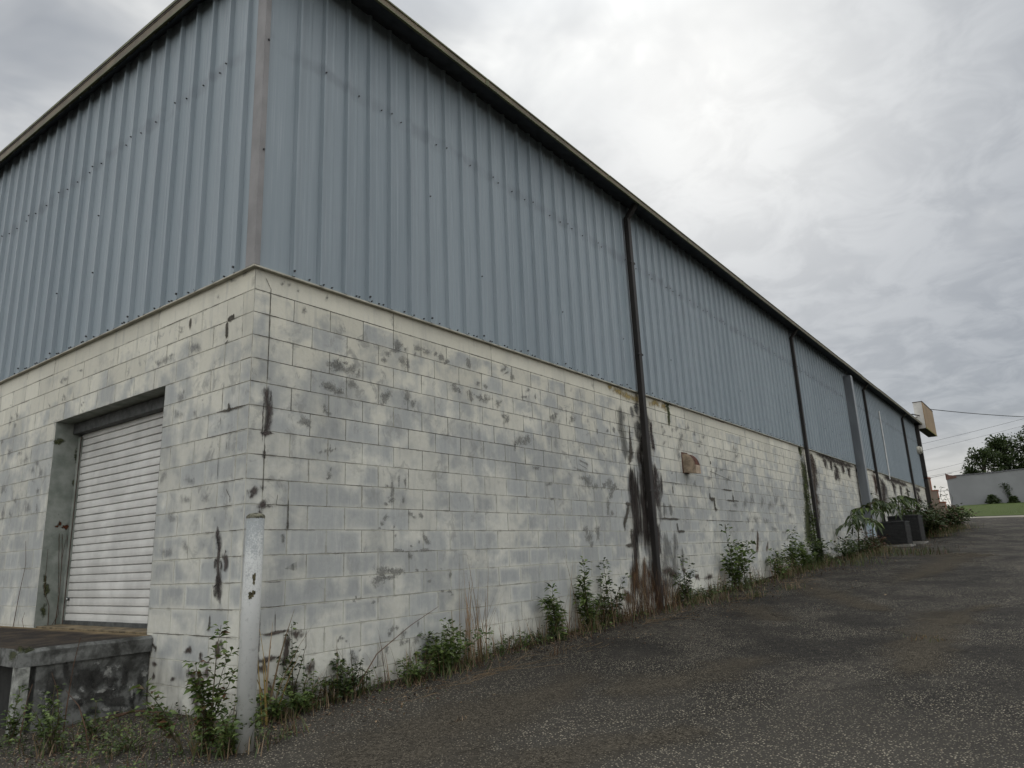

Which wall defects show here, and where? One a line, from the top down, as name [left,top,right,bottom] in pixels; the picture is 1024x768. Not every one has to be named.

leakage [261,388,273,458]
leakage [619,403,712,599]
leakage [799,447,857,556]
leakage [213,527,228,599]
leakage [43,662,156,723]
leakage [171,640,222,686]